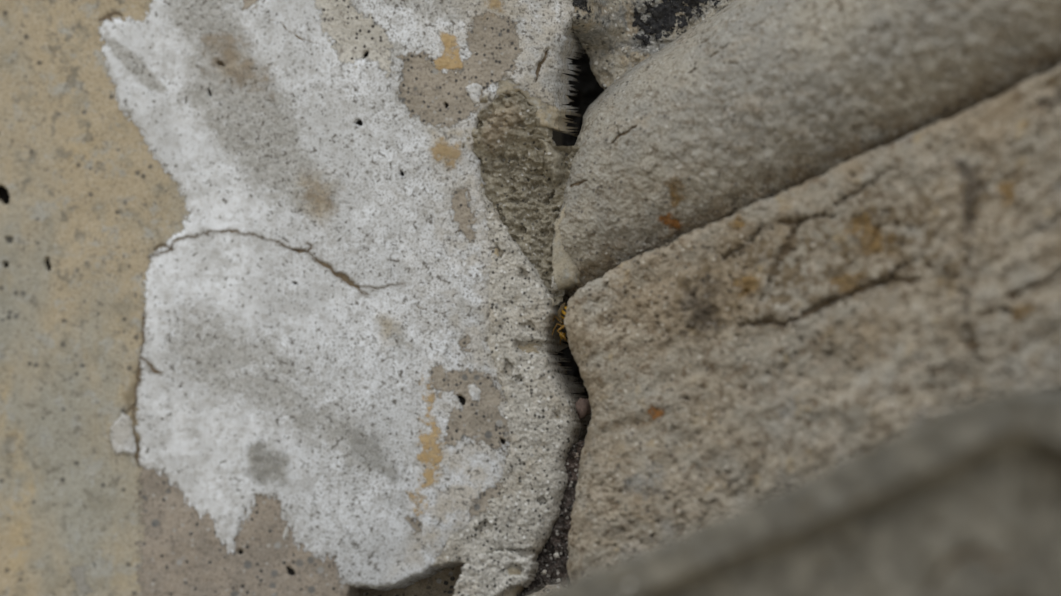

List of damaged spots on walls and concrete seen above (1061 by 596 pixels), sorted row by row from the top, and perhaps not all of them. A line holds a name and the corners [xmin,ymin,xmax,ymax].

rust [434,33,463,70]
crack [535,27,605,146]
spalling [313,0,580,306]
crack [148,230,389,296]
crack [723,180,877,288]
crack [742,260,918,327]
crack [980,272,1060,316]
peeling [109,413,539,596]
rust [409,384,443,516]
crack [517,295,592,596]